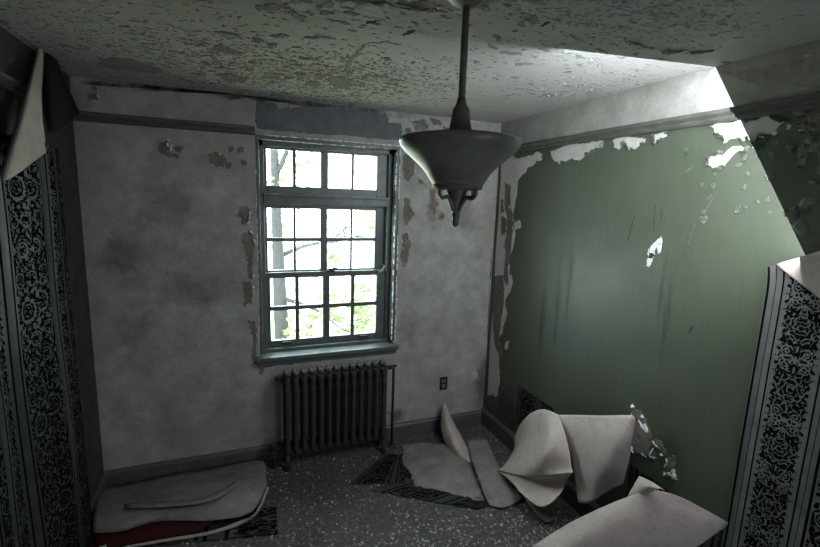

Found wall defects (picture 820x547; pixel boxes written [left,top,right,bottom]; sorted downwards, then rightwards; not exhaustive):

peeling [0,0,774,342]
peeling [487,131,667,397]
peeling [705,114,807,172]
spalling [630,404,677,480]